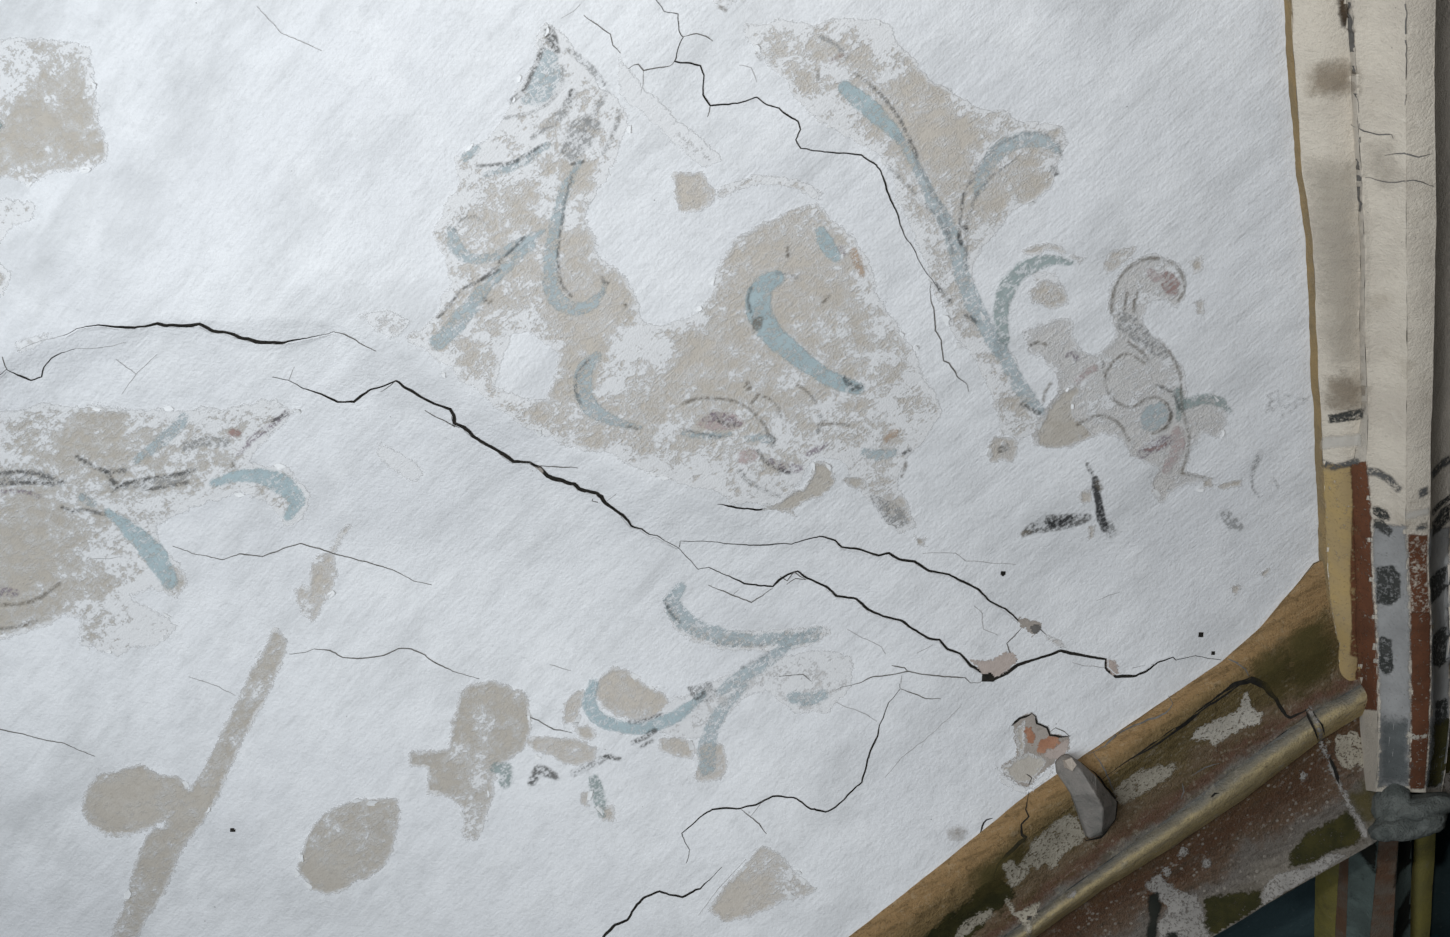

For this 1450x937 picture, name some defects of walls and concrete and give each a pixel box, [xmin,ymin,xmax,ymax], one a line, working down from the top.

crack [562,0,969,392]
crack [0,322,1325,937]
spalling [1001,712,1070,787]